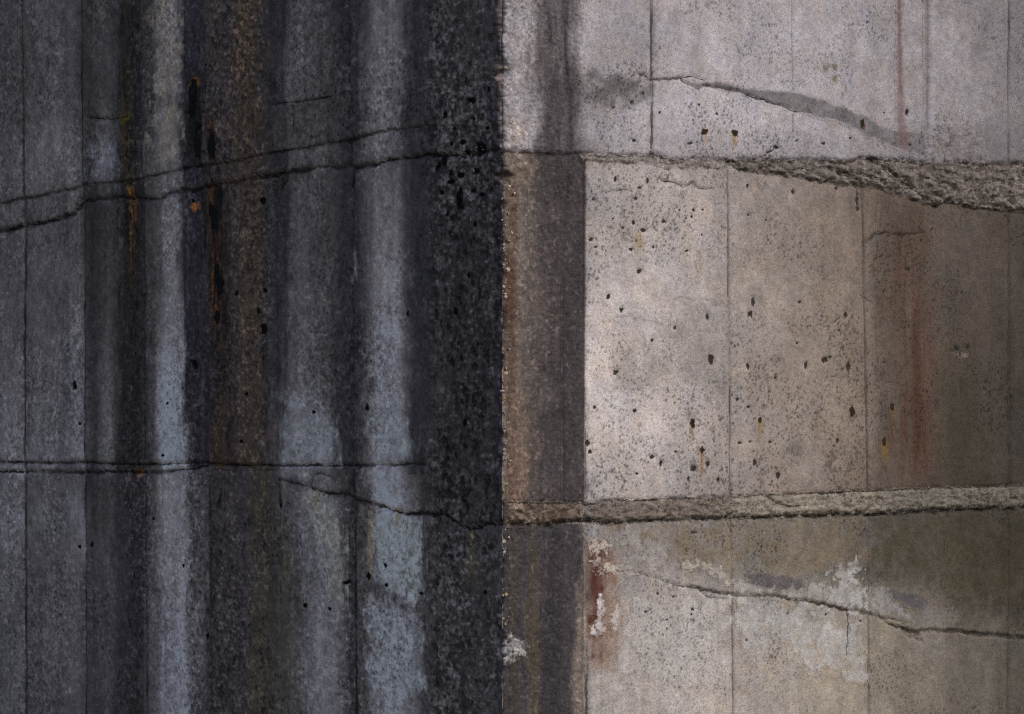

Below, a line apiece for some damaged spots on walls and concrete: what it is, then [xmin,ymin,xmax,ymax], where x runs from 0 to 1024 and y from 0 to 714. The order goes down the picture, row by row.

crack [0,96,1024,233]
crack [639,74,812,113]
spalling [578,119,1024,213]
rust [894,0,912,158]
rust [186,68,235,469]
water stain [83,0,344,714]
spalling [500,312,517,462]
water stain [262,0,962,714]
crack [0,461,1024,530]
spalling [502,481,1024,559]
rust [583,524,629,677]
crack [614,569,1024,655]